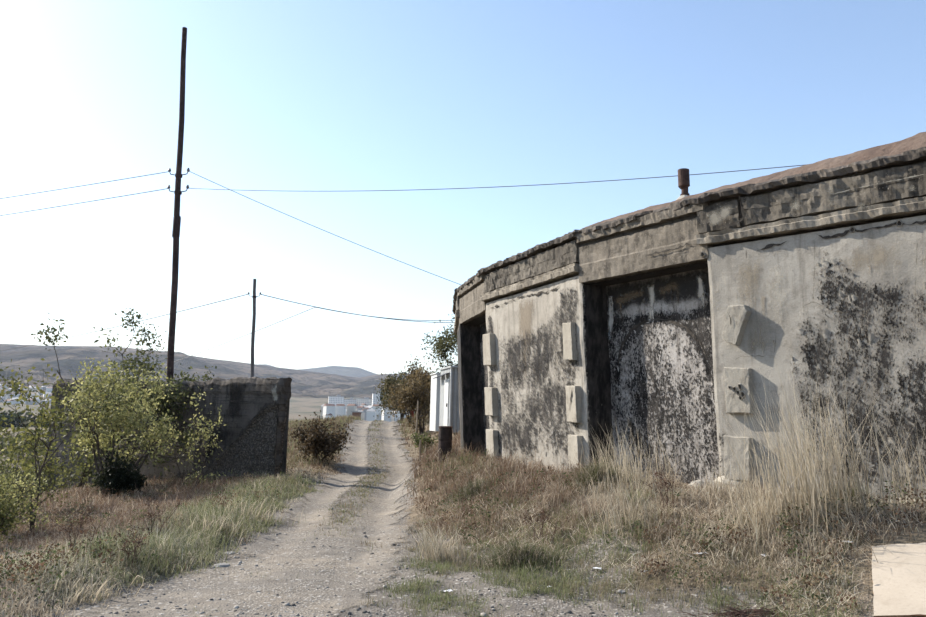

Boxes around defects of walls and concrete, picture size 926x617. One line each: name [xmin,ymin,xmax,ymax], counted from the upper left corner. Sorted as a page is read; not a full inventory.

crack [804,220,926,319]
water stain [519,302,533,370]